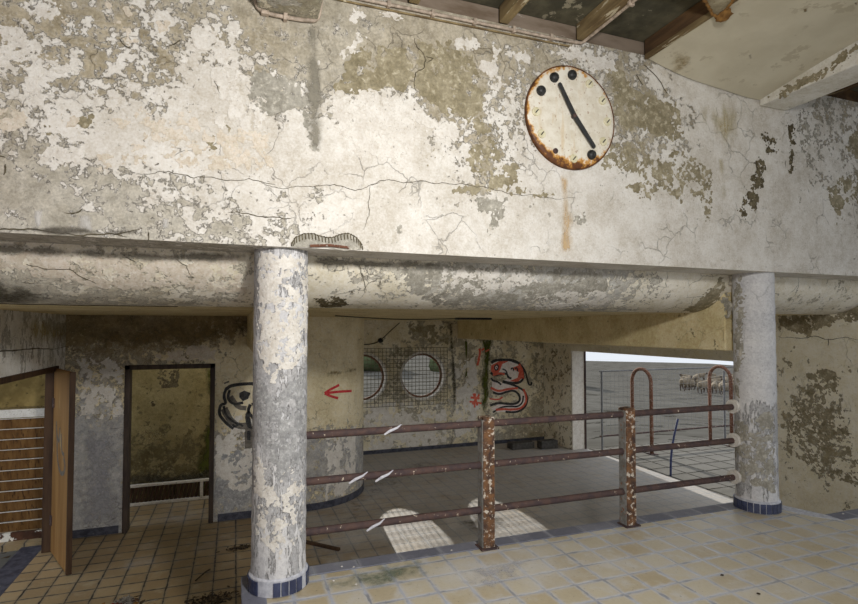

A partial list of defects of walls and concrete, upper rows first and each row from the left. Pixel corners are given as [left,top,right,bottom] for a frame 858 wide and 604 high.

leakage [0,285,34,303]
crack [0,345,66,353]
peeling [0,0,83,103]
crack [0,209,149,262]
spalling [38,20,320,172]
peeling [0,233,363,559]
leakage [308,58,322,145]
crack [147,171,573,230]
peeling [324,356,480,501]
peeling [331,8,555,235]
spalling [546,44,713,227]
spalling [737,103,839,220]